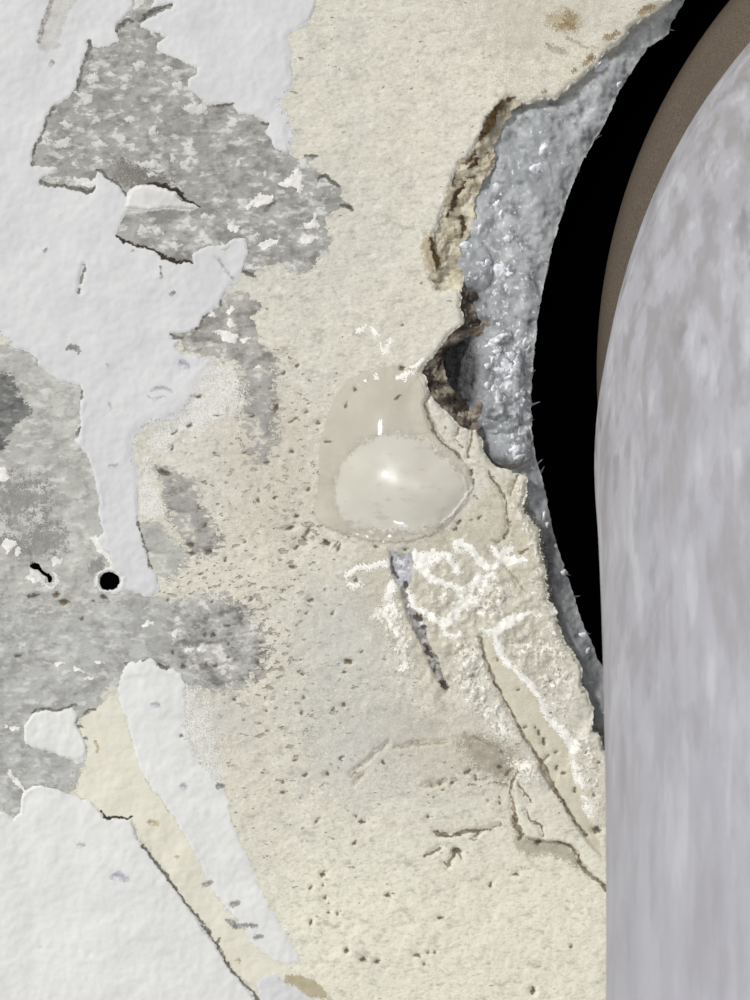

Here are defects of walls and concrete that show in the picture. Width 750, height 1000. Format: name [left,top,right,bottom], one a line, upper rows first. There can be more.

peeling [0,0,353,1000]
leakage [202,378,606,835]
crack [423,637,606,892]
spalling [422,0,730,750]